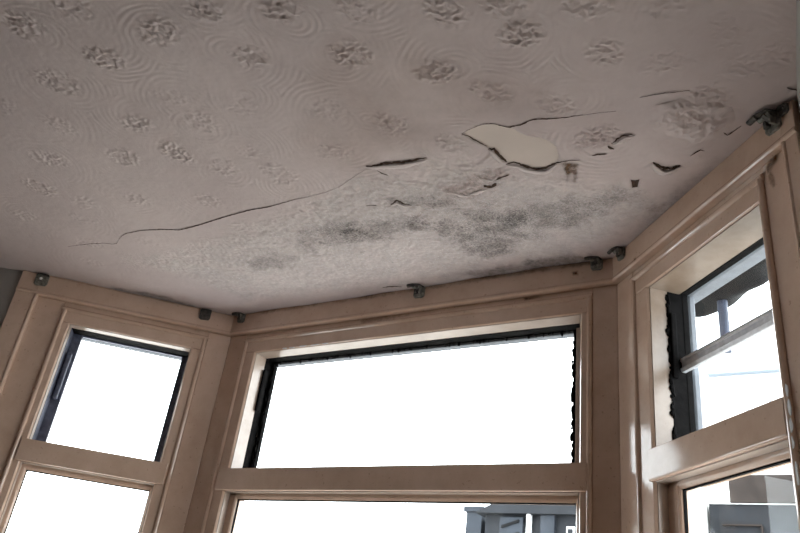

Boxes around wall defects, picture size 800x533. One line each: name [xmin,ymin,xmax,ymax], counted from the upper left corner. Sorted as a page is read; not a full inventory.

peeling [463,124,559,174]
crack [68,158,424,247]